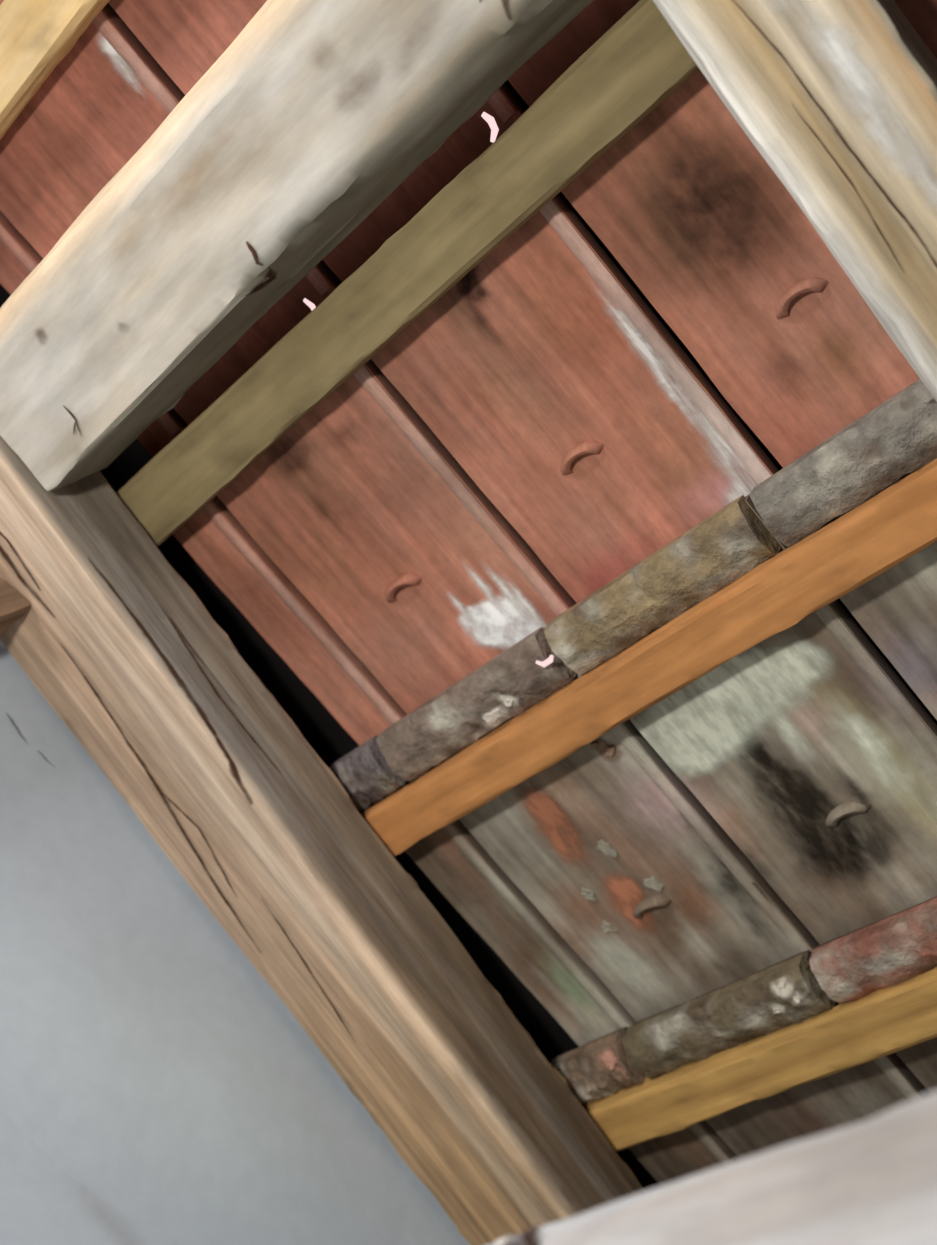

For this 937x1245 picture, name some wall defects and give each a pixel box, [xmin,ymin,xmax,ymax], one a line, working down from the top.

crack [732,0,937,272]
crack [64,406,80,435]
crack [0,532,53,615]
damp [451,572,547,648]
crack [7,714,52,765]
crack [93,565,279,804]
damp [634,642,828,776]
damp [847,718,909,790]
crack [62,646,351,1035]